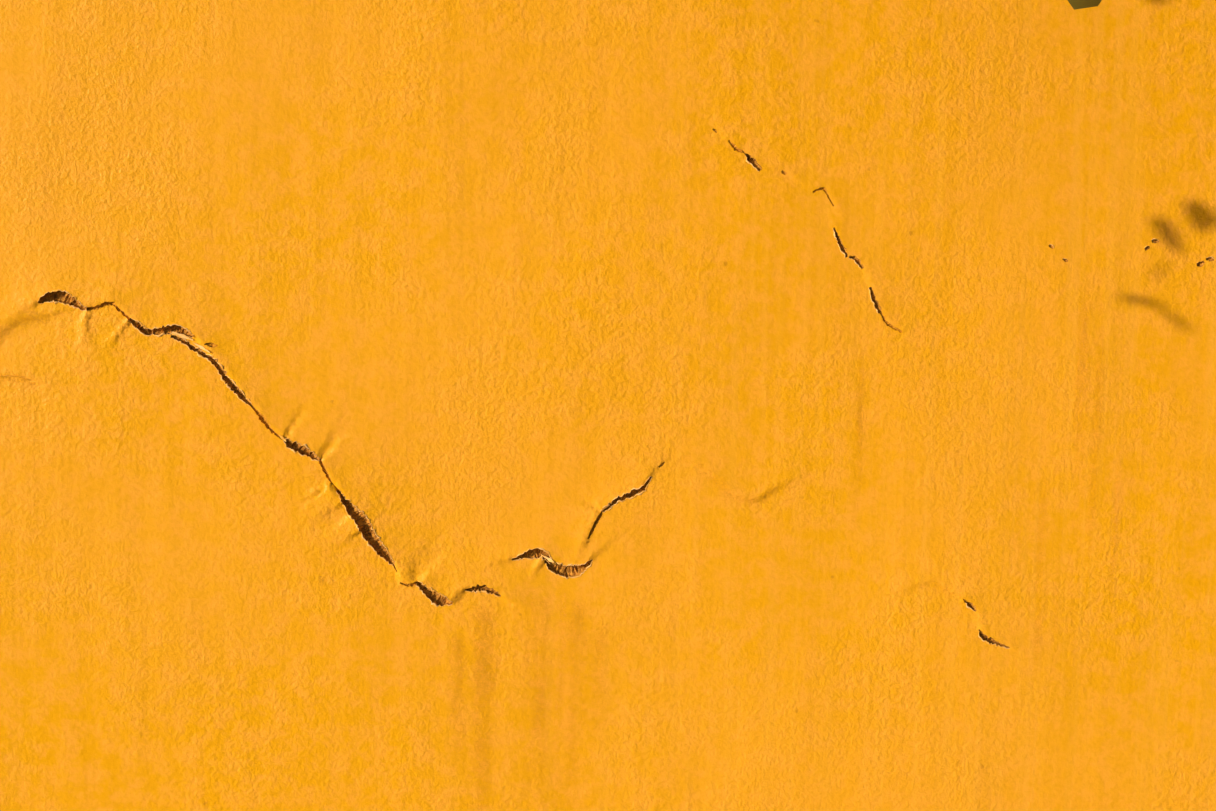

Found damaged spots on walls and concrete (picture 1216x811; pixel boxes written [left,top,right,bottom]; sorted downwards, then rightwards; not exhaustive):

crack [712,129,787,175]
crack [812,187,902,333]
crack [0,289,501,607]
crack [512,456,784,579]
crack [921,581,1010,649]